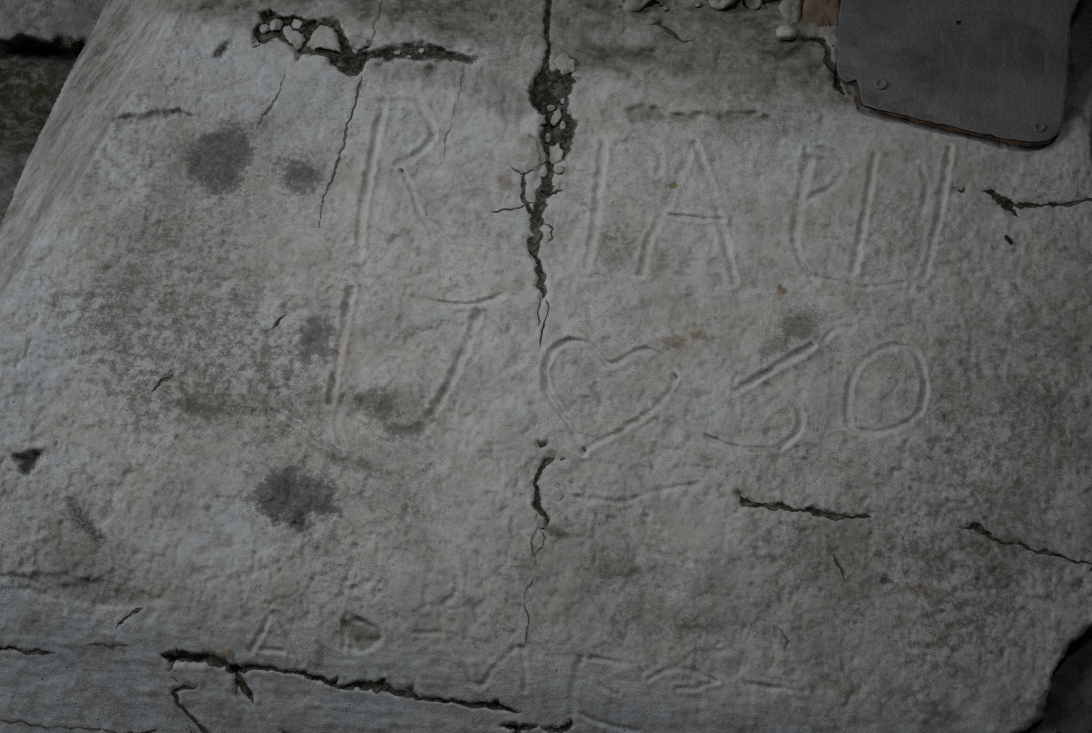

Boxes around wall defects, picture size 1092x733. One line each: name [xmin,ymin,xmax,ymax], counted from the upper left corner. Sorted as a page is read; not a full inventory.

crack [318,75,362,228]
crack [490,0,580,352]
crack [957,185,1092,216]
crack [523,442,565,645]
crack [738,491,870,520]
crack [963,523,1092,574]
crack [0,719,159,733]
crack [162,649,572,733]